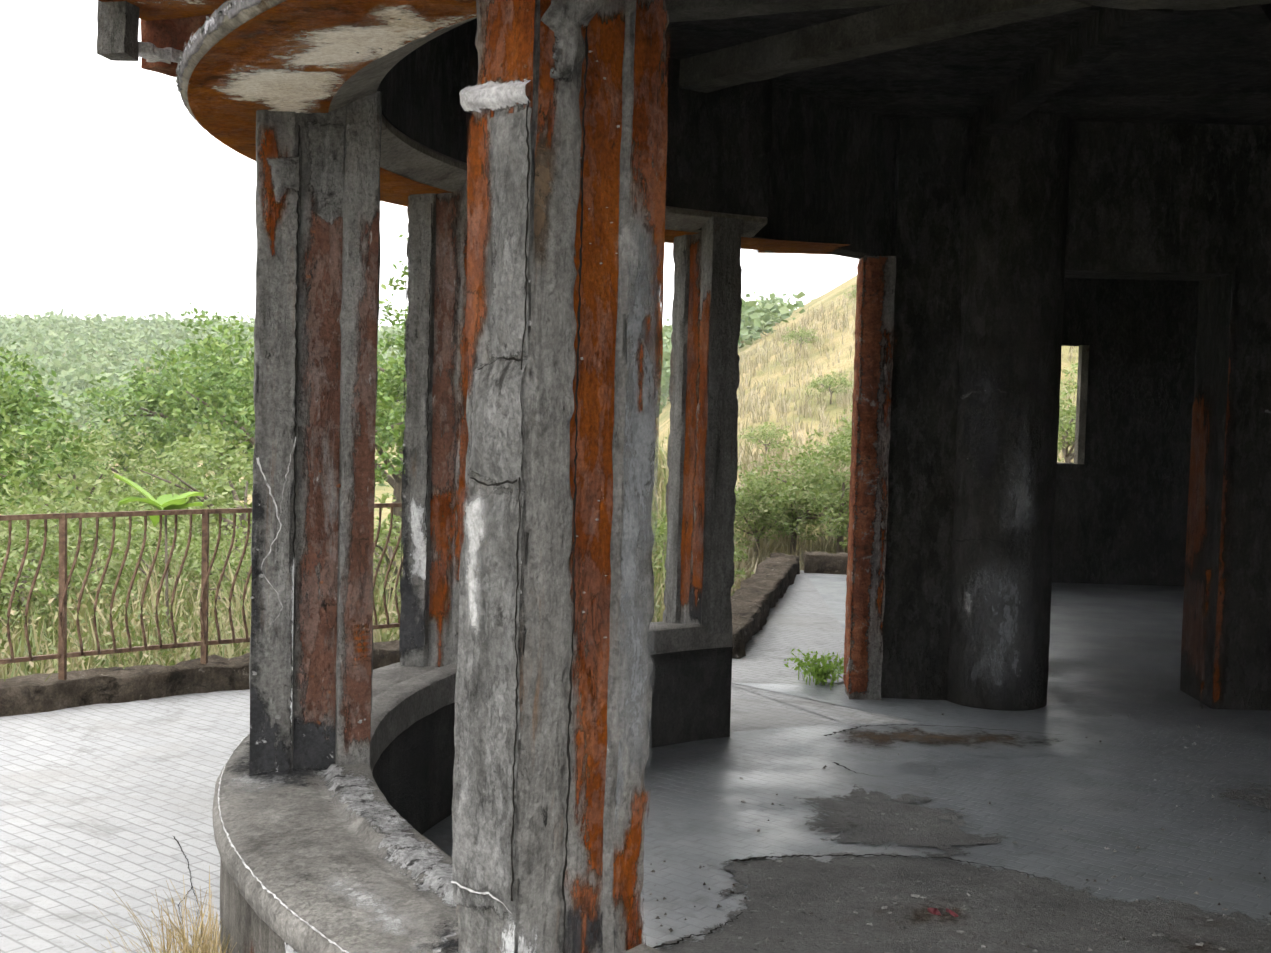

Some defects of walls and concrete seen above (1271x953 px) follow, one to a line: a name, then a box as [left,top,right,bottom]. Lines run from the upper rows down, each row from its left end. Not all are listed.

peeling [175,0,242,112]
crack [256,125,300,745]
rust [187,0,557,752]
spalling [288,487,525,921]
crack [451,96,531,913]
spalling [541,0,603,82]
rust [565,0,710,953]
rust [741,237,849,255]
rust [1181,288,1233,709]
crack [433,932,457,953]